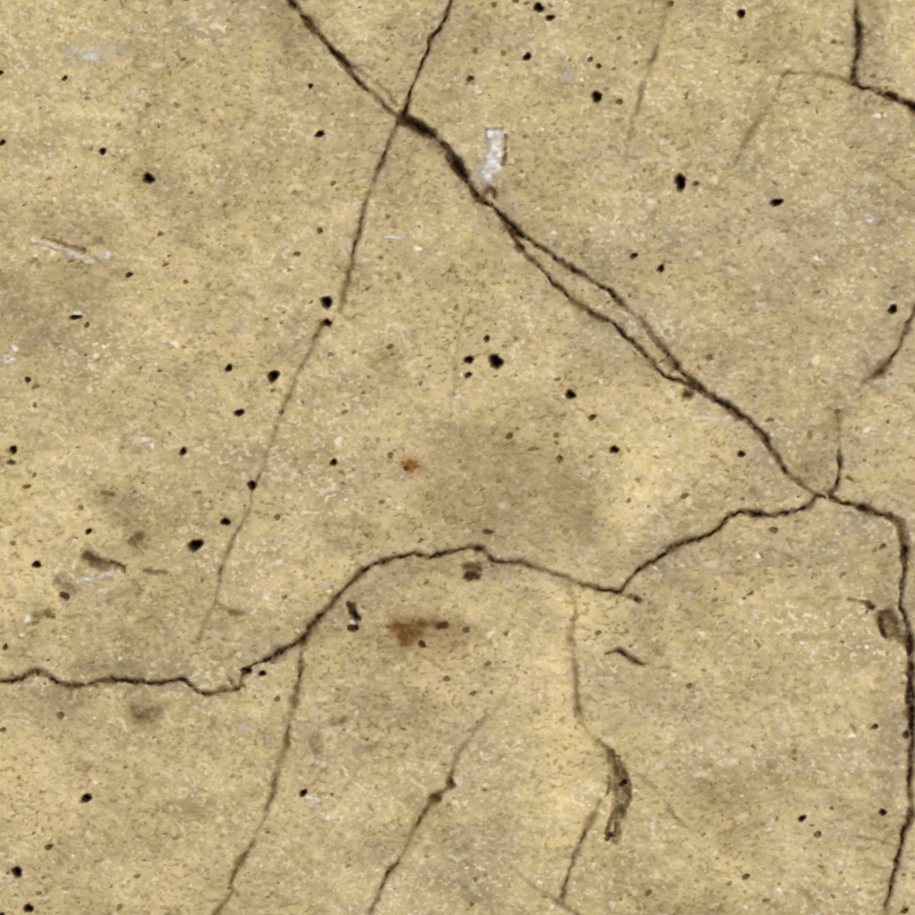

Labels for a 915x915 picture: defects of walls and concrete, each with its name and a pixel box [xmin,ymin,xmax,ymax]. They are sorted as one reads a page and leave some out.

crack [287,0,370,92]
crack [342,200,367,297]
crack [370,0,915,912]
crack [0,545,567,707]
corrosion [386,620,448,648]
crack [265,779,276,810]
crack [230,844,252,883]